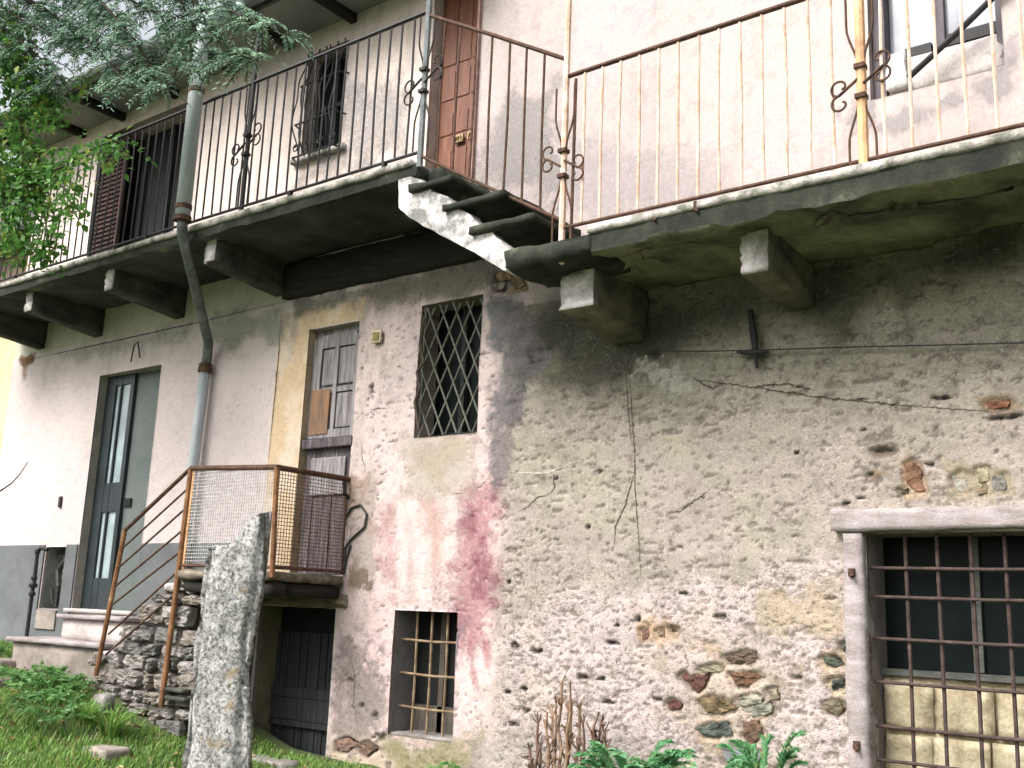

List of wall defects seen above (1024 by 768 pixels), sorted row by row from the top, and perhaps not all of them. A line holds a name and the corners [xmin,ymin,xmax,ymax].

leakage [914,226,1018,275]
leakage [803,267,893,320]
leakage [487,293,785,490]
crack [671,376,1023,415]
crack [614,367,641,573]
spalling [899,454,928,499]
spalling [942,460,1014,499]
peeling [331,637,385,756]
spalling [667,646,781,762]